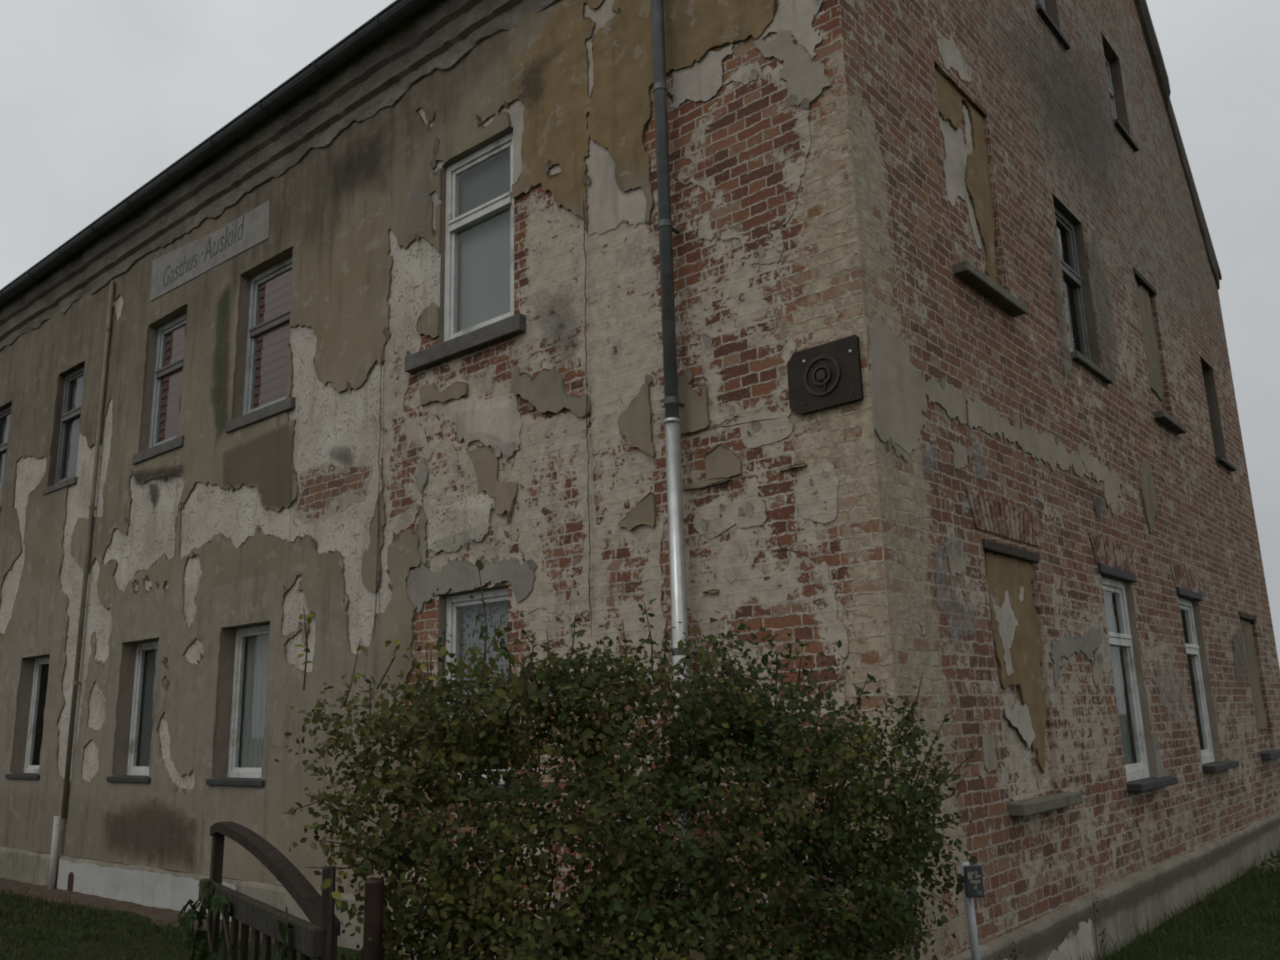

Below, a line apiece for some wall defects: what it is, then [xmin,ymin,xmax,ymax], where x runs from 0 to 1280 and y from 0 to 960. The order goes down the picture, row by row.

flaking render [759,0,823,59]
peeling [582,137,646,235]
flaking render [671,43,811,265]
flaking render [940,105,982,250]
flaking render [701,318,796,448]
peeling [0,456,46,634]
peeling [58,191,441,781]
flaking render [504,411,666,684]
flaking render [693,495,849,717]
flaking render [990,586,1024,676]
flaking render [1005,704,1035,749]
peeling [1047,919,1094,960]